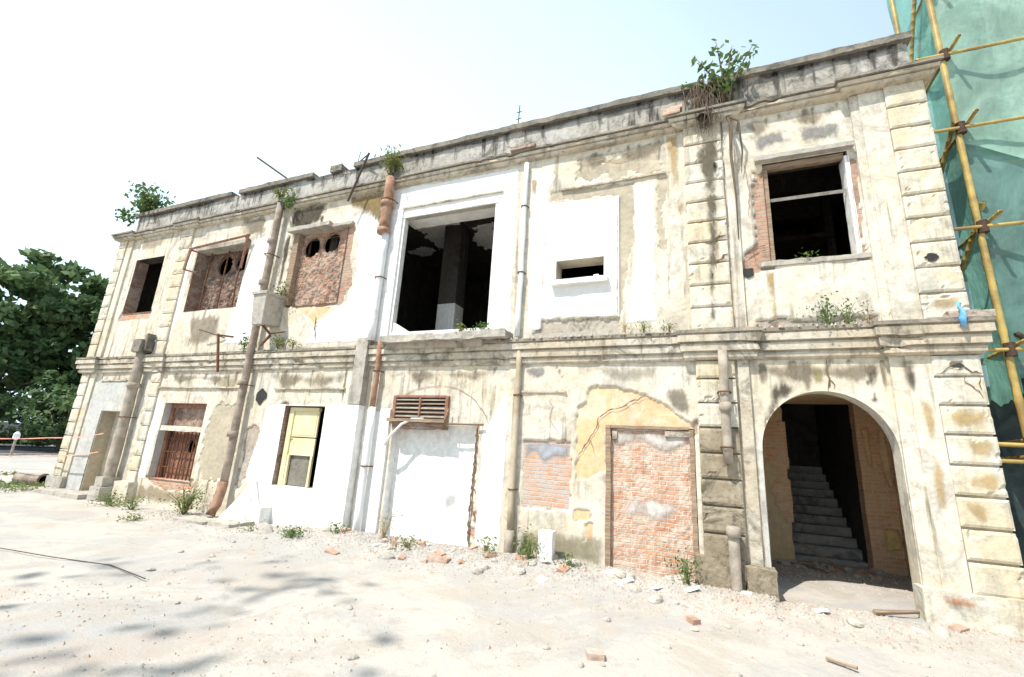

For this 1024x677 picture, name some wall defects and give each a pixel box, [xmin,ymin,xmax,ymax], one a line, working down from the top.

water stain [658,136,677,170]
water stain [697,143,717,290]
spalling [288,226,356,323]
flaking render [146,402,260,492]
flaking render [522,385,699,540]
crack [579,396,646,454]
water stain [759,364,767,381]
water stain [766,361,830,426]
water stain [867,360,886,384]
water stain [904,362,915,387]